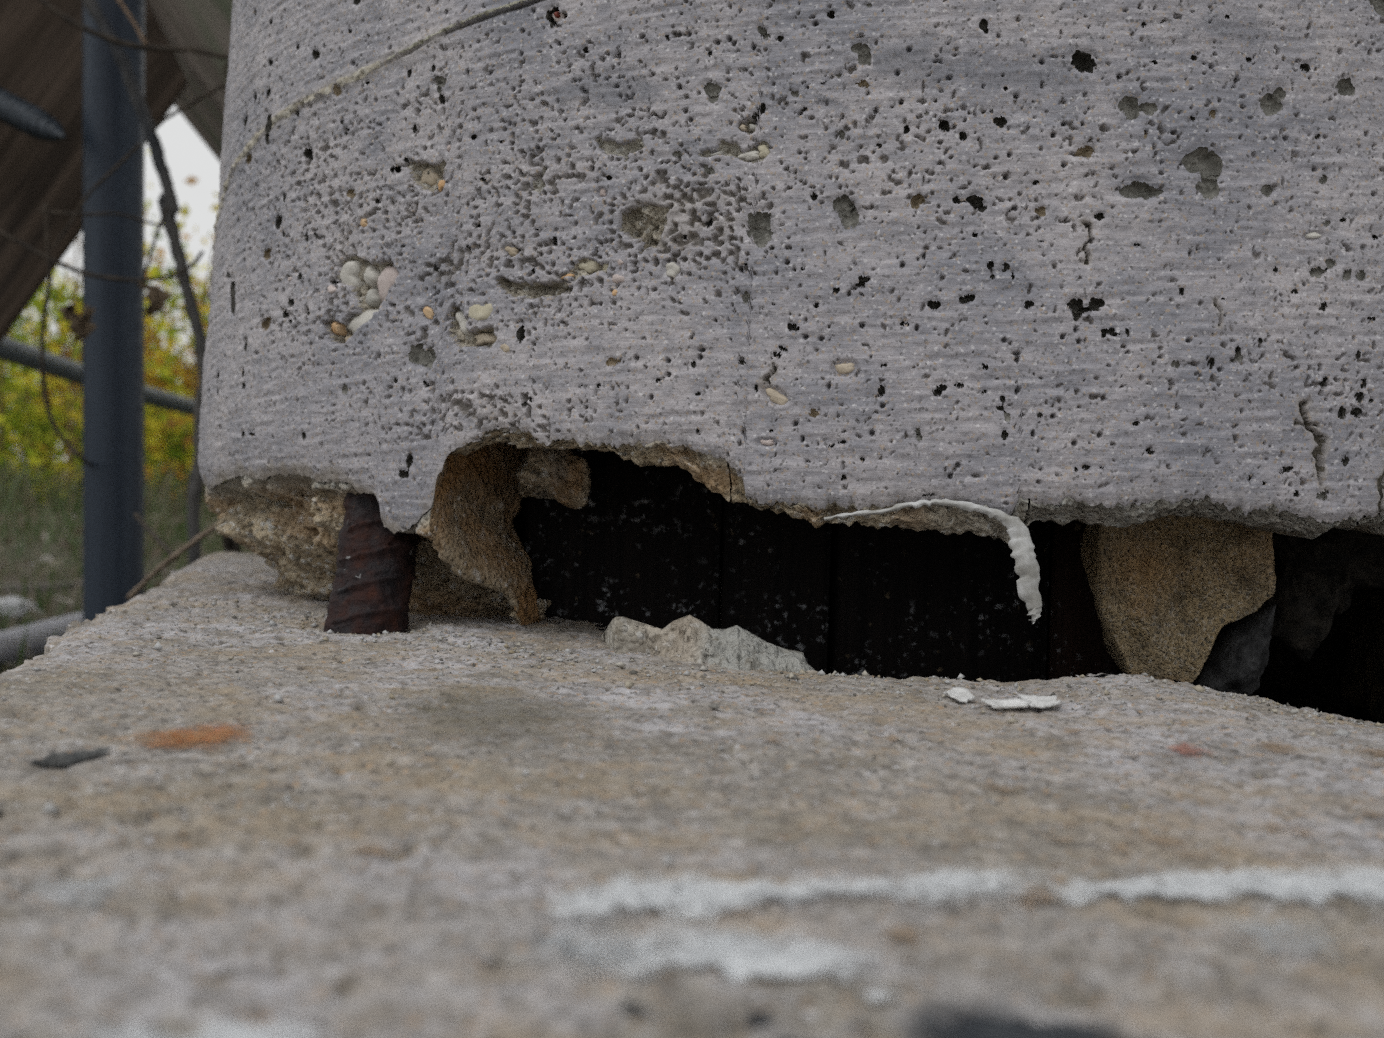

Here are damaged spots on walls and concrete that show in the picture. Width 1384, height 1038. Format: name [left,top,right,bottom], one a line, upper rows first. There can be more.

spalling [205,474,370,601]
spalling [398,427,1384,625]
peeling [944,687,975,703]
peeling [1018,694,1061,709]